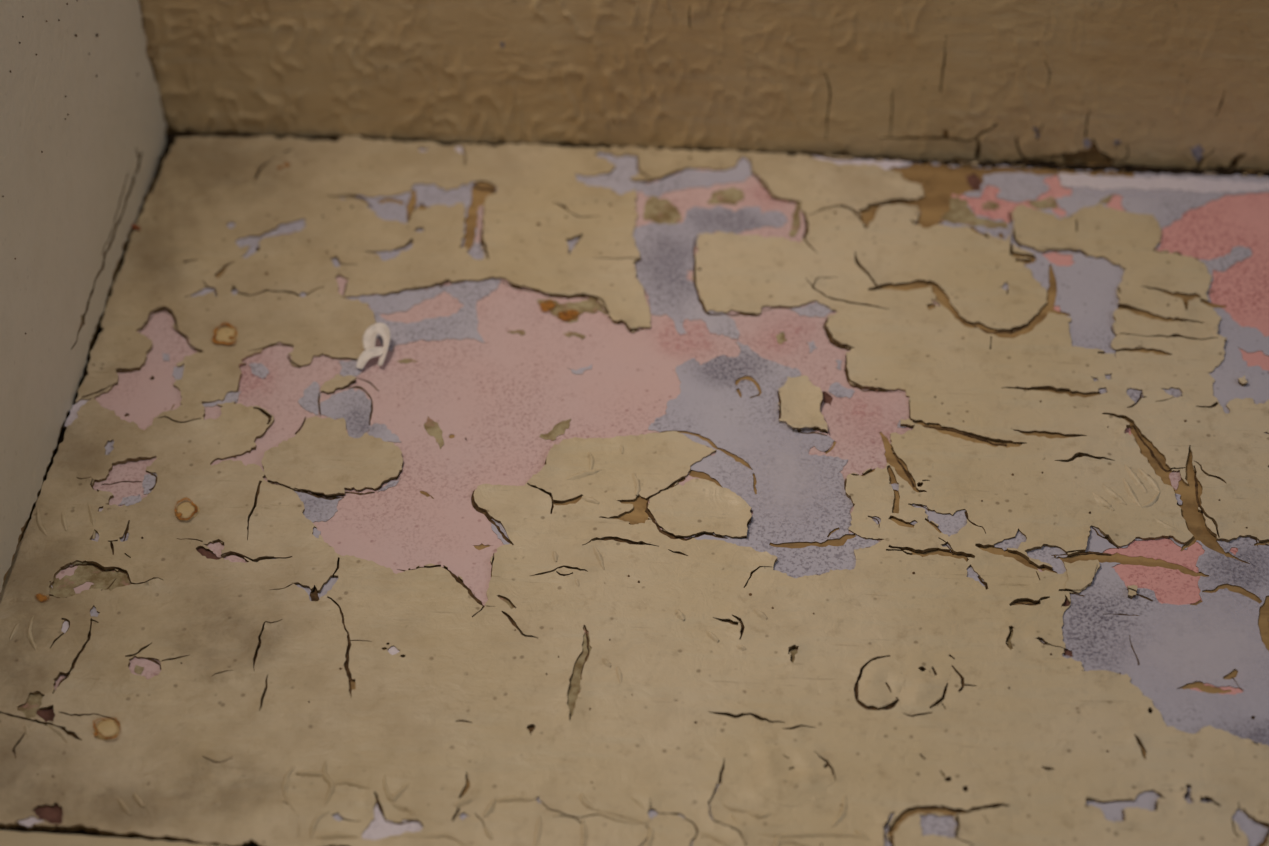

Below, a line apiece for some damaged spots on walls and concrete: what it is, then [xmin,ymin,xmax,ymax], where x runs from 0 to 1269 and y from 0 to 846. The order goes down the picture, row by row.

peeling [63,309,202,430]
crack [30,132,340,520]
peeling [197,152,915,607]
crack [853,202,1070,349]
peeling [812,111,1269,414]
peeling [50,524,132,598]
peeling [91,441,158,511]
crack [844,418,1269,606]
crack [335,603,356,698]
crack [567,626,592,720]
peeling [1062,527,1269,746]
crack [883,806,997,846]